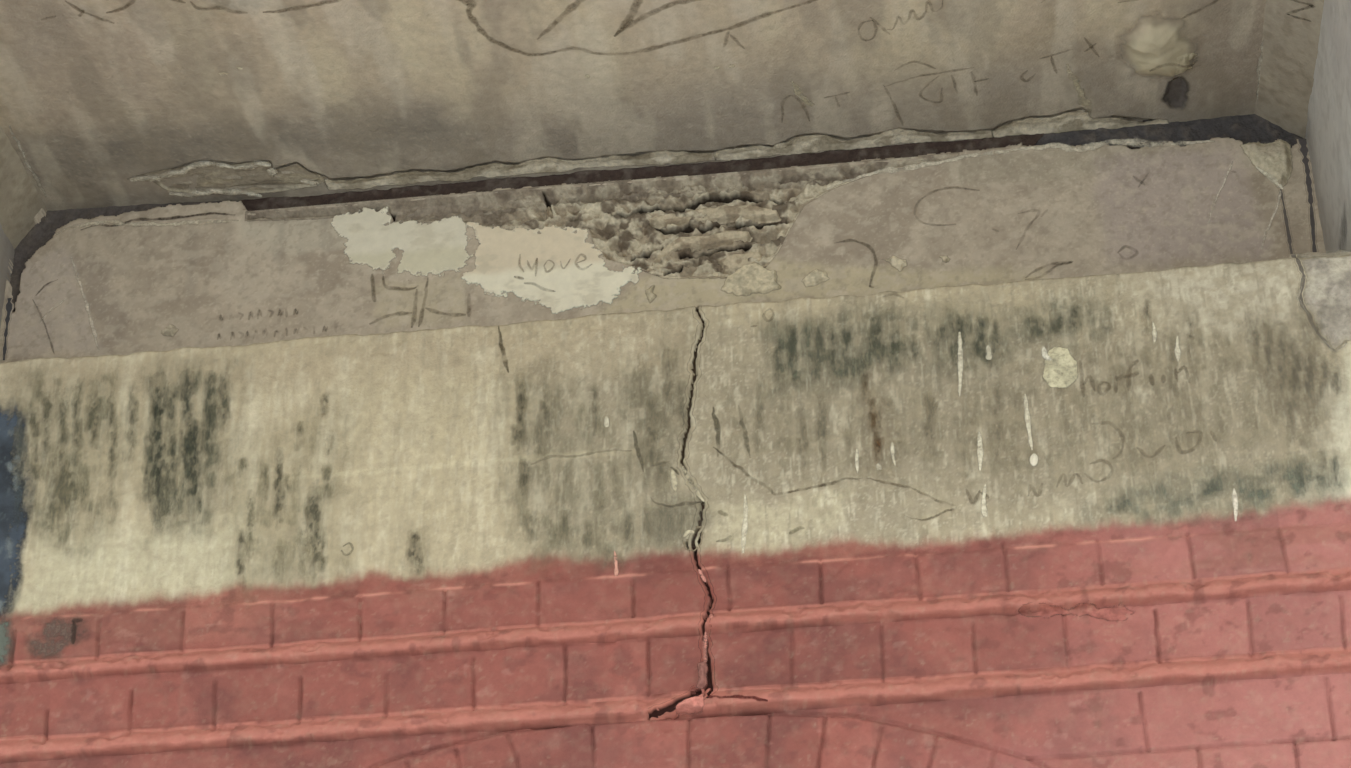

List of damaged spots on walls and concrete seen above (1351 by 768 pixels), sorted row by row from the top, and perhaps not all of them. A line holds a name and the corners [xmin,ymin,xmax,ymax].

spalling [54,110,1215,314]
leakage [773,318,914,385]
leakage [942,316,996,361]
spalling [1297,251,1351,351]
leakage [17,381,113,541]
leakage [146,372,227,515]
leakage [264,465,283,512]
leakage [310,470,329,563]
crack [633,305,768,721]
crack [788,478,953,521]
leakage [1156,476,1271,514]
leakage [1271,462,1336,495]